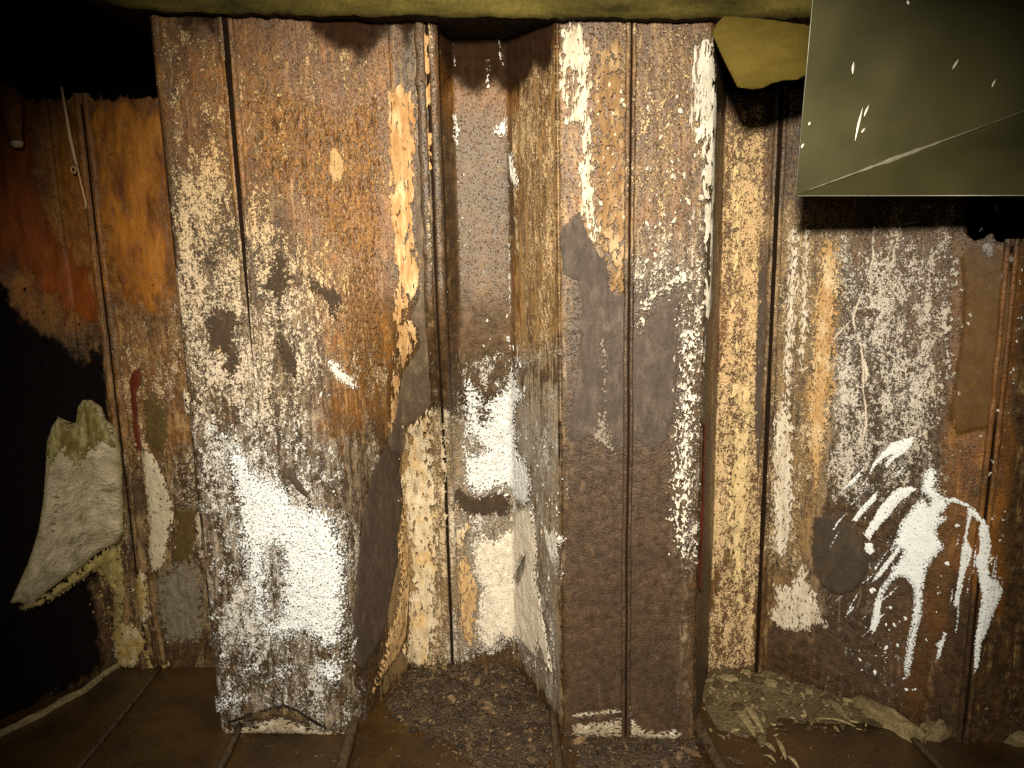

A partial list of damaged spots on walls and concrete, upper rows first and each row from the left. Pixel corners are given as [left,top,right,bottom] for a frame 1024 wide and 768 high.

rust [89,97,169,312]
peeling [353,33,433,669]
leakage [508,153,519,188]
peeling [559,38,679,452]
leakage [936,257,961,341]
leakage [205,418,357,714]
leakage [366,336,554,702]